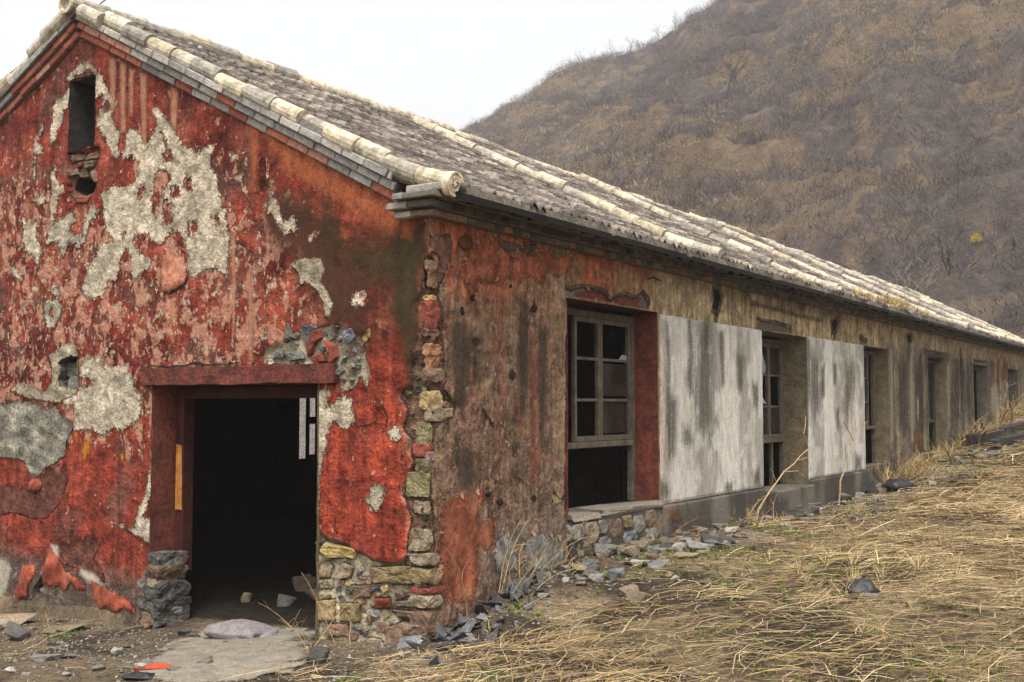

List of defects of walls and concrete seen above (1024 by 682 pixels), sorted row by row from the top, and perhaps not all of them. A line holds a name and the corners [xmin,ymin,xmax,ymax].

flaking render [10,59,231,301]
flaking render [229,151,319,244]
damp [250,125,422,368]
flaking render [0,341,141,521]
flaking render [259,258,373,513]
damp [454,324,480,412]
flaking render [315,233,651,643]
damp [520,302,546,432]
damp [666,317,761,457]
damp [807,340,857,433]
flaking render [14,438,192,629]